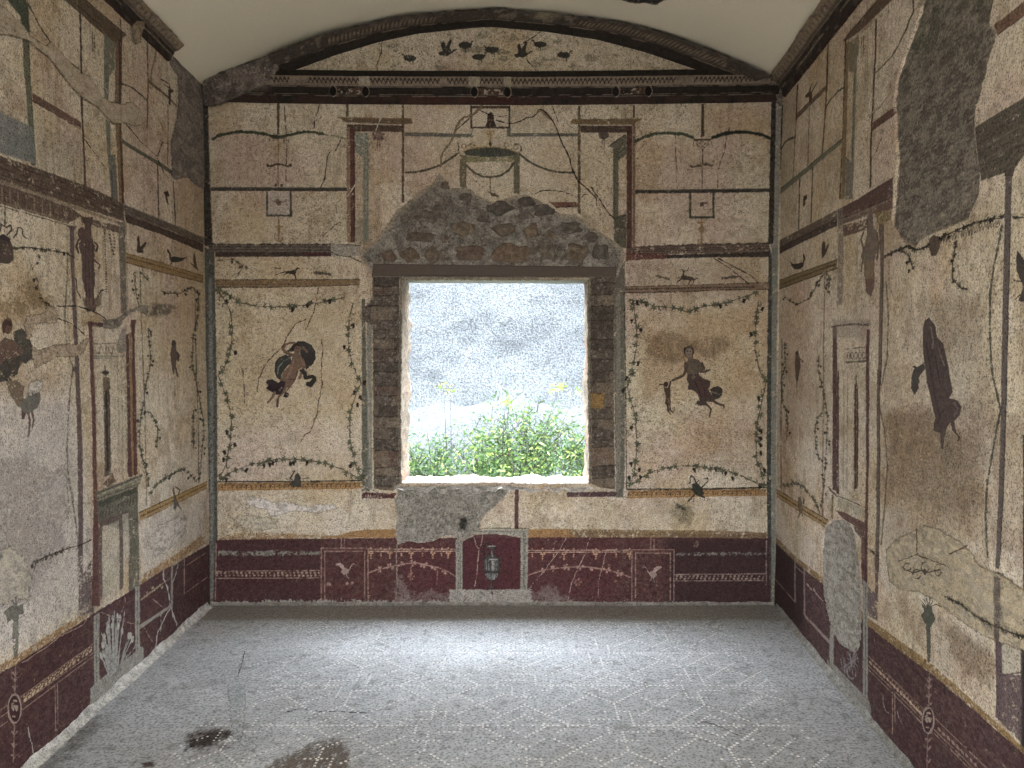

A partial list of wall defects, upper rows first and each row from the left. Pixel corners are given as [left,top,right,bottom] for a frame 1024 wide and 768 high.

flaking render [170,52,279,189]
crack [440,105,615,219]
flaking render [894,0,996,247]
flaking render [361,174,625,545]
flaking render [823,519,862,653]